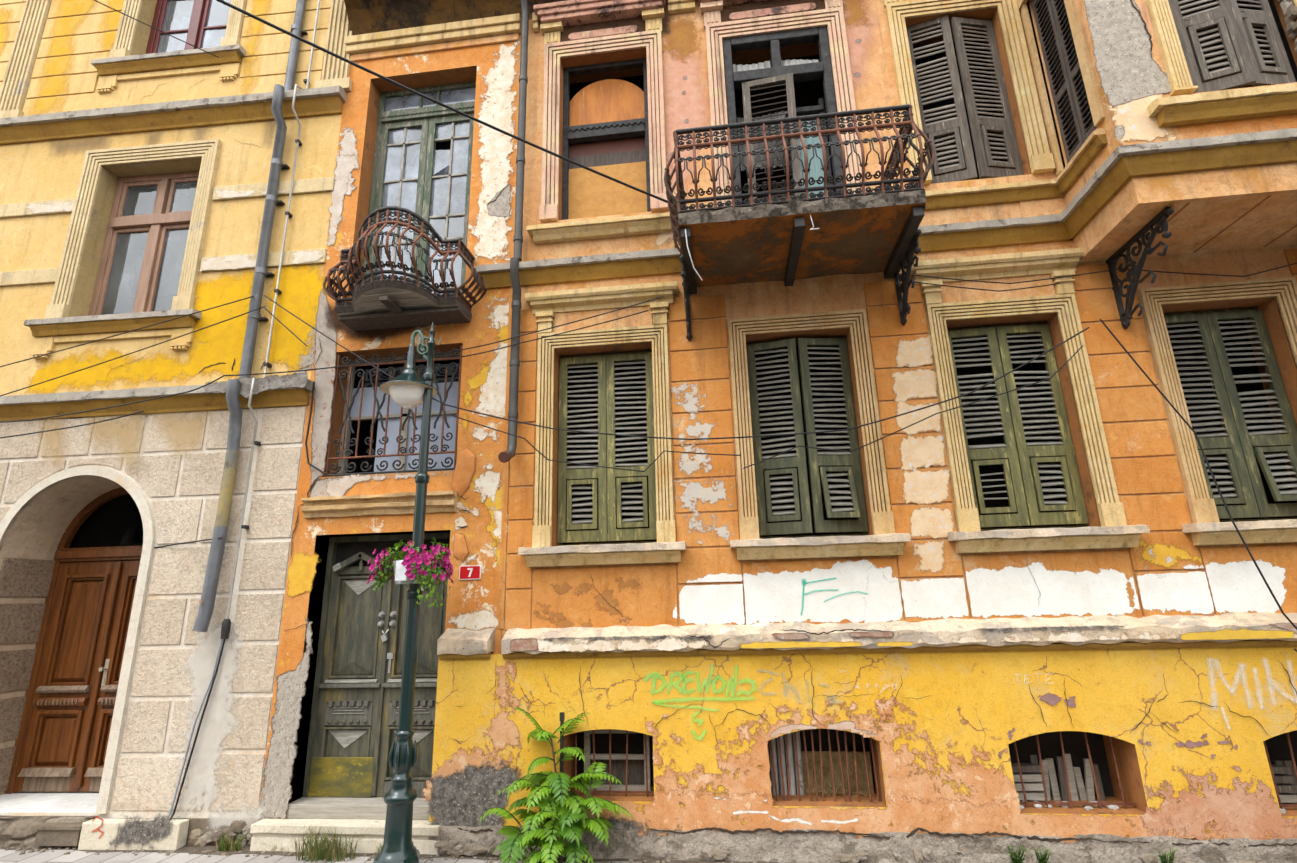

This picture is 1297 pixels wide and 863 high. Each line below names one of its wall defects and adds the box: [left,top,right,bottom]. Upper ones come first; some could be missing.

spalling [1084,0,1177,145]
peeling [468,40,520,264]
peeling [457,296,509,441]
peeling [669,382,737,545]
peeling [891,335,955,573]
spalling [259,618,313,820]
peeling [287,552,319,597]
peeling [422,577,713,802]
crack [655,702,768,744]
crack [811,669,931,725]
peeling [551,695,1297,853]
peeling [949,623,1297,644]